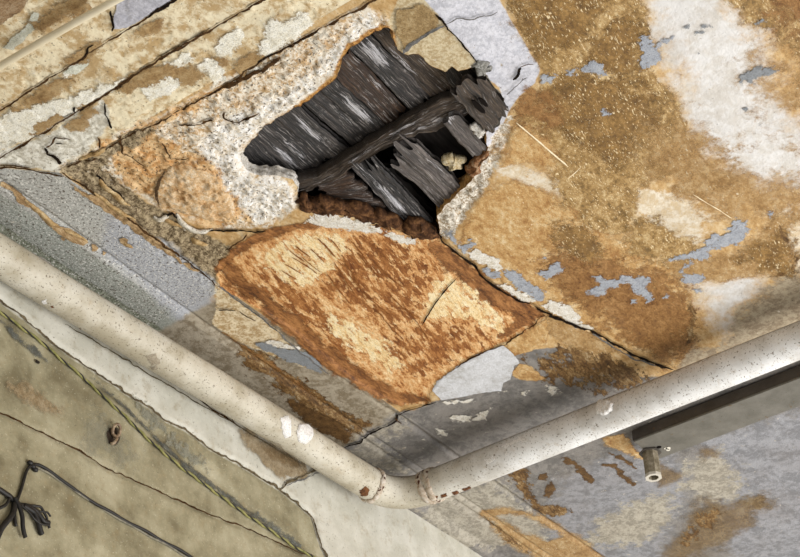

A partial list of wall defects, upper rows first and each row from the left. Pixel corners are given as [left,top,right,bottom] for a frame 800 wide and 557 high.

peeling [141,26,245,102]
peeling [257,11,315,59]
crack [0,0,376,374]
spalling [241,146,311,198]
leakage [459,0,800,397]
rust [214,221,547,407]
crack [422,226,675,371]
peeling [432,345,519,405]
crack [0,299,328,557]
leakage [480,468,603,557]
leakage [561,457,595,484]
leakage [601,433,643,486]